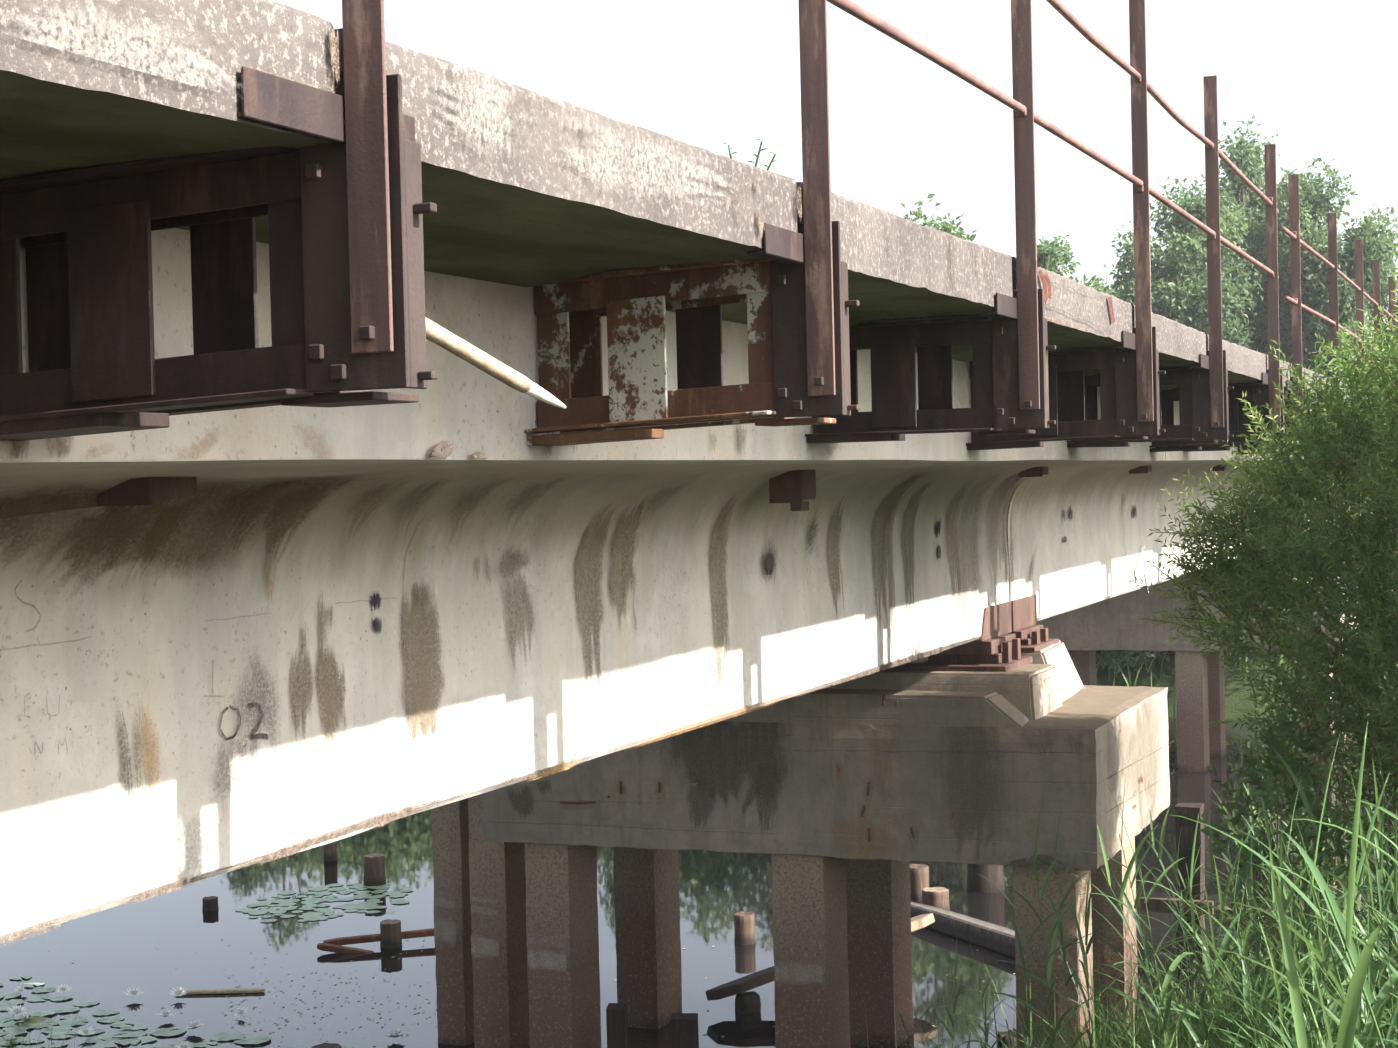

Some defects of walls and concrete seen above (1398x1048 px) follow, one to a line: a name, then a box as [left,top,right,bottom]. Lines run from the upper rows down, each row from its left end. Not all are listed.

damp [240,596,346,748]
damp [402,584,444,740]
damp [575,504,642,685]
damp [710,498,736,690]
damp [872,474,927,638]
damp [947,476,1021,612]
damp [671,721,791,828]